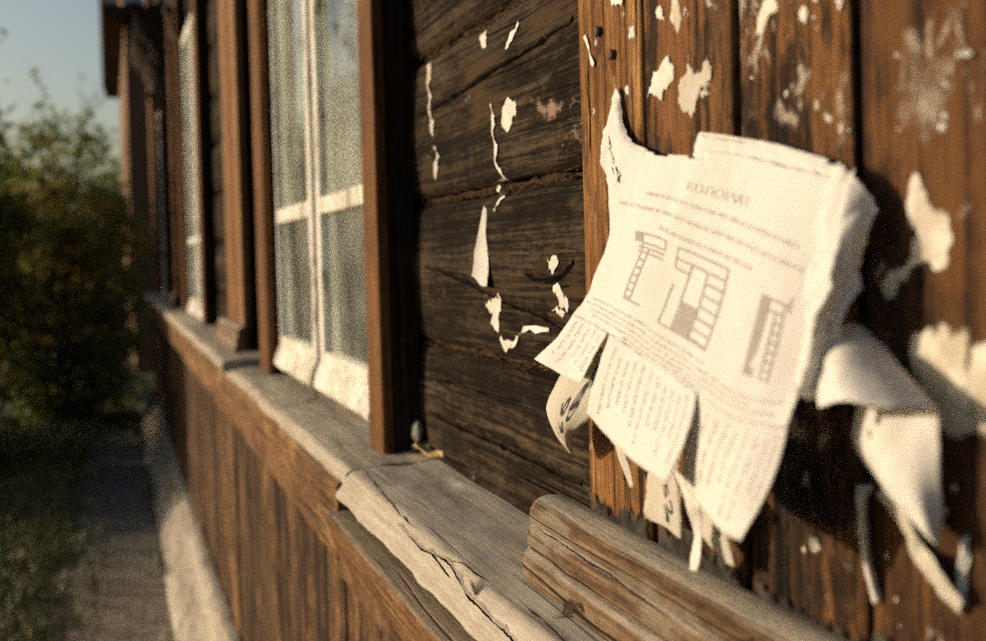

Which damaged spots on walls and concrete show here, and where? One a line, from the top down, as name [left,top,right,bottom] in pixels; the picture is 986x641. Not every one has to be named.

crack [419,16,573,115]
crack [359,466,518,641]
crack [520,602,564,641]